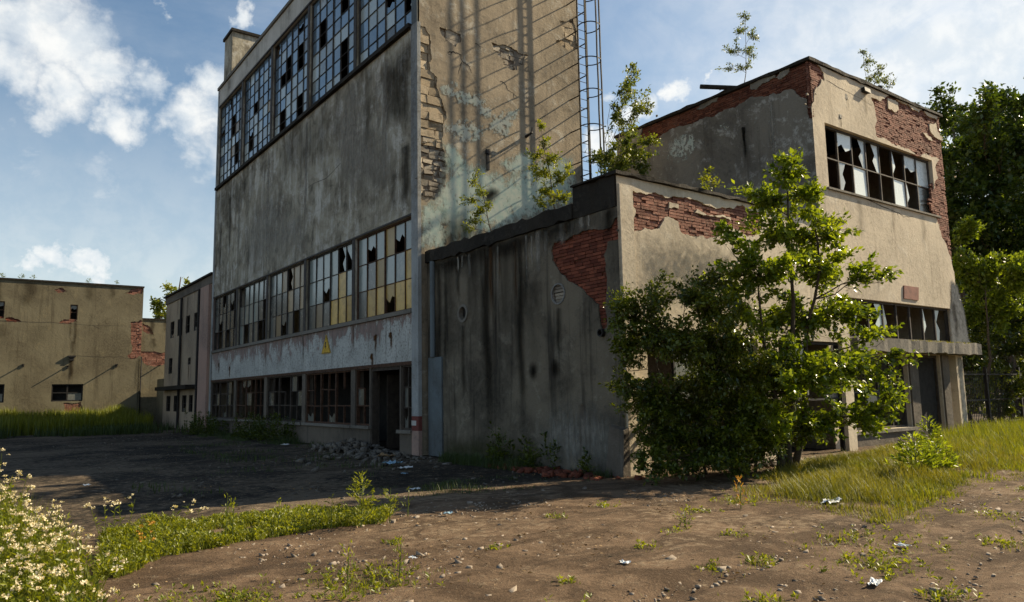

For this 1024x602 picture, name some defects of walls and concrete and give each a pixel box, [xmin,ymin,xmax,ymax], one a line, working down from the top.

peeling [415,27,574,247]
spalling [633,192,760,239]
spalling [641,61,823,160]
spalling [871,96,962,261]
spalling [128,320,165,367]
leakage [435,215,590,383]
spalling [552,218,619,329]